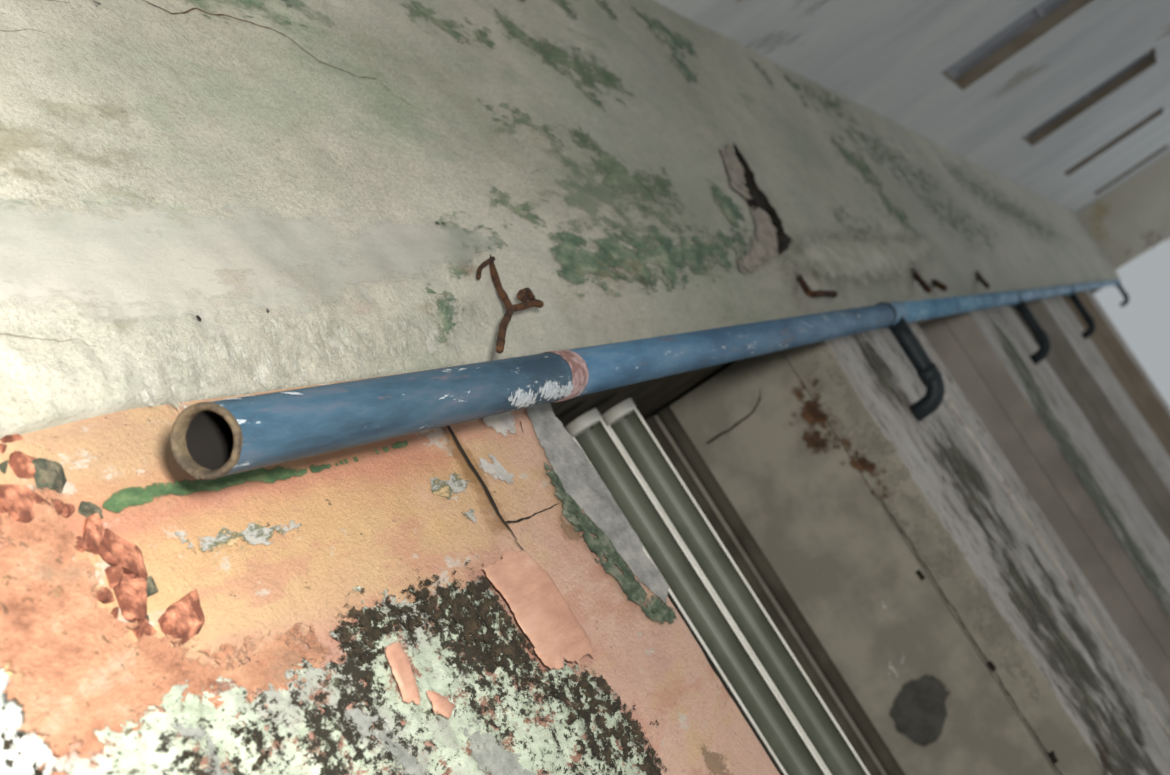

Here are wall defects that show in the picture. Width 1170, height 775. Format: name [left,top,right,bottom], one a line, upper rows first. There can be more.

spalling [720,144,778,274]
peeling [0,434,655,775]
peeling [483,411,516,437]
crack [446,426,560,551]
peeling [544,462,677,625]
rust [790,380,893,498]
leakage [853,317,1170,775]